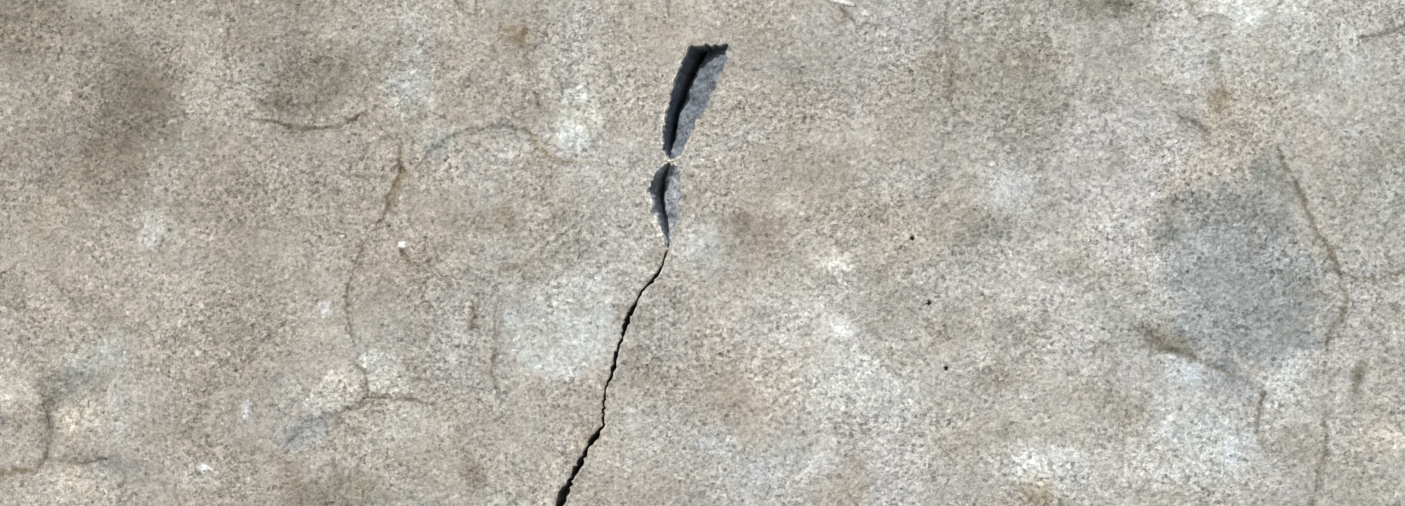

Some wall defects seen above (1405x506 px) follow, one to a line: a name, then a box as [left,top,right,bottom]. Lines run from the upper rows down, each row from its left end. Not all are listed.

crack [554,246,671,506]